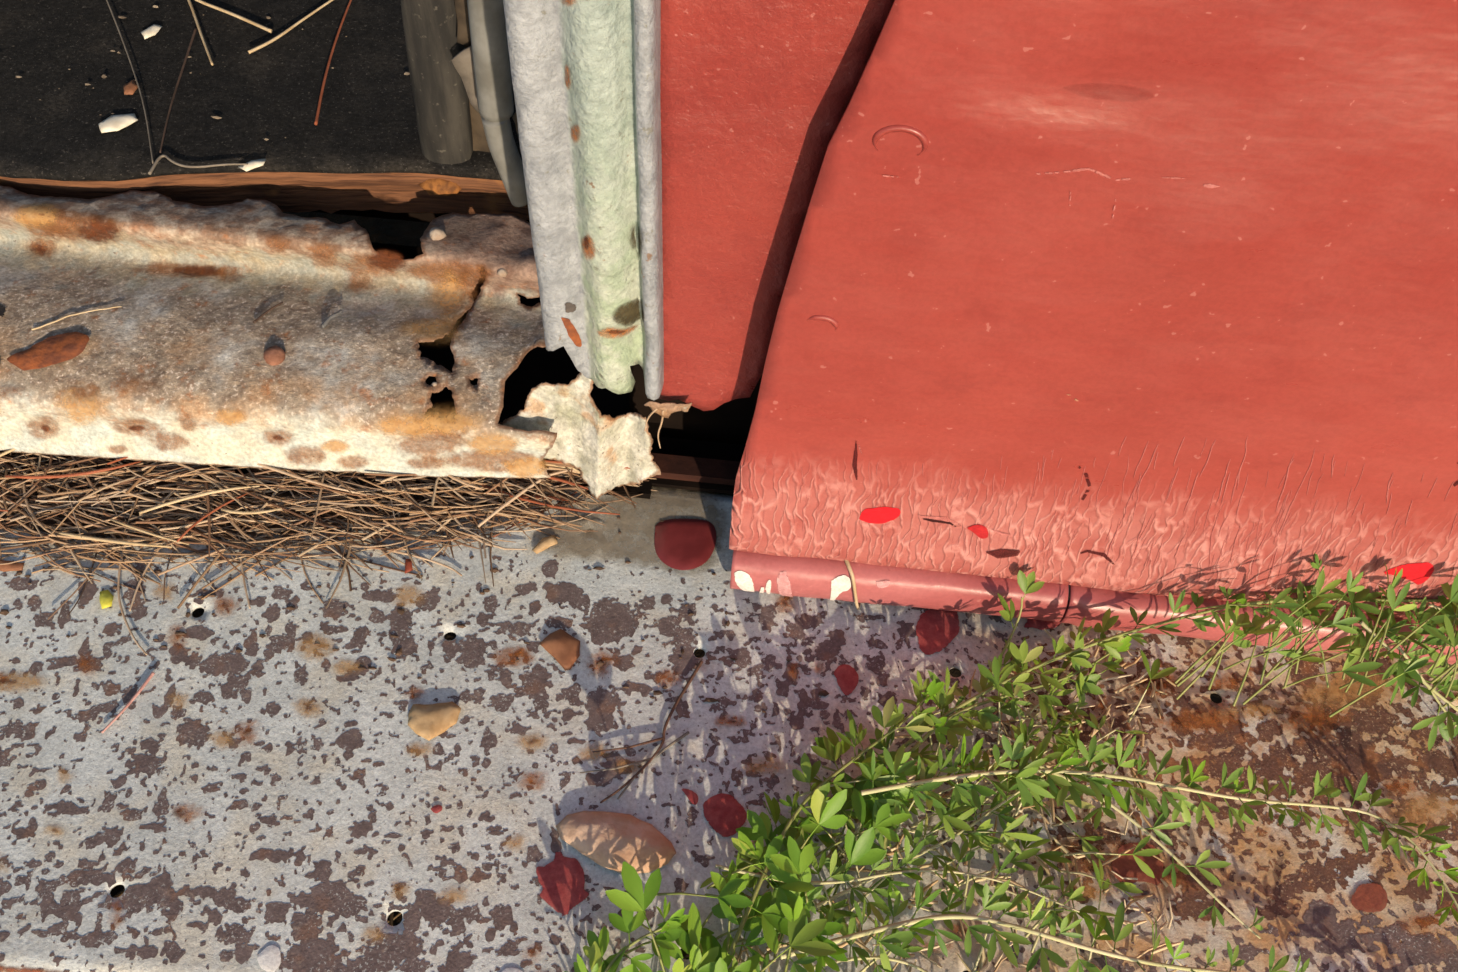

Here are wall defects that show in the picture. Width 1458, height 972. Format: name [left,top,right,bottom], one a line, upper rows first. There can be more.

rust [16,205,117,255]
rust [582,237,594,257]
rust [137,264,237,280]
rust [312,244,487,334]
spalling [561,303,582,347]
rust [599,299,644,338]
rust [29,417,57,437]
rust [111,416,194,453]
rust [217,412,244,425]
rust [266,432,364,468]
rust [1138,675,1175,697]
peeling [0,540,1458,972]